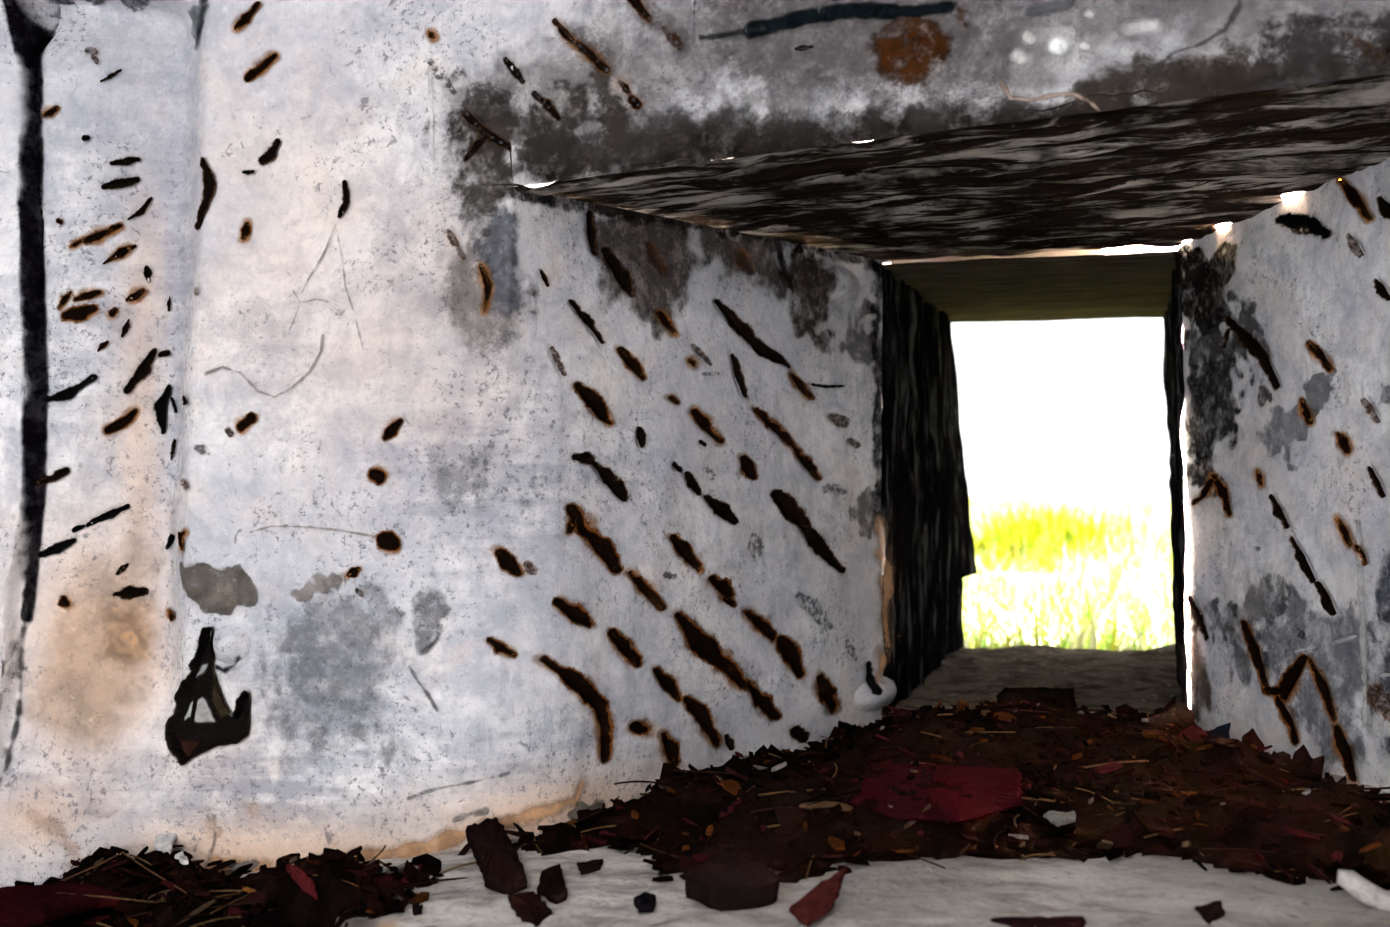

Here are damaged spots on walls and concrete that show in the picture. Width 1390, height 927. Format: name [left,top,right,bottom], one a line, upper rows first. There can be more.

damp [1121,22,1158,36]
rust [872,16,951,85]
damp [1012,31,1091,64]
crack [205,236,360,398]
spalling [164,528,257,766]
damp [1204,554,1390,763]
rust [629,720,652,737]
rust [724,734,735,751]
rust [789,725,810,744]